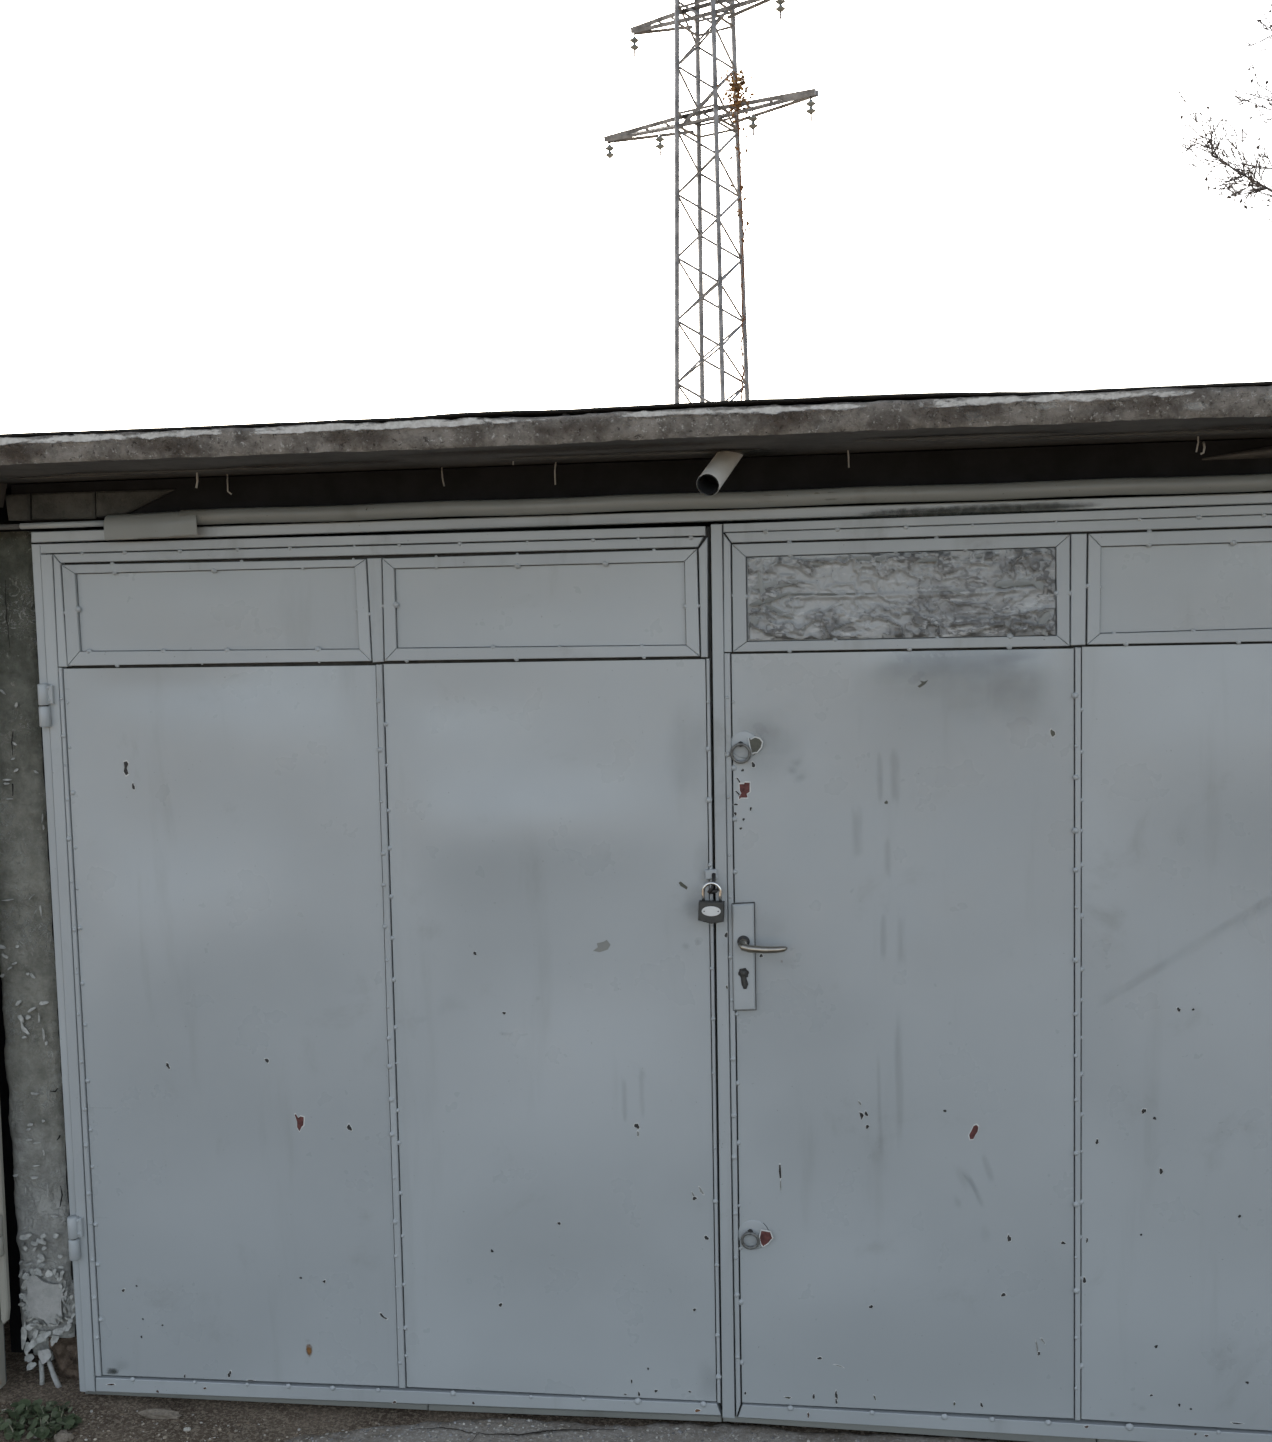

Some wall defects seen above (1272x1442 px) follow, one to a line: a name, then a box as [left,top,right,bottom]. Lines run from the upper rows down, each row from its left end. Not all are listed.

peeling [18,1215,79,1388]